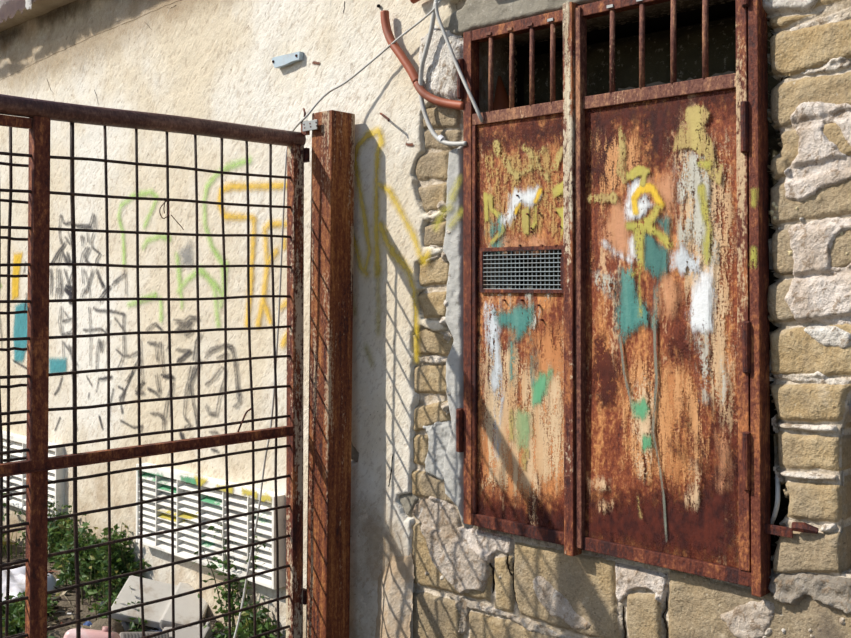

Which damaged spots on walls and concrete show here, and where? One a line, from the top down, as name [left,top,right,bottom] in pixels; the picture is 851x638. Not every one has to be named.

peeling [0,0,36,23]
peeling [763,0,818,20]
rust [477,117,563,162]
rust [585,88,736,189]
peeling [769,101,851,349]
rust [477,188,564,532]
rust [585,332,739,569]
crack [489,555,517,603]
crack [620,606,628,638]
crack [661,597,669,638]